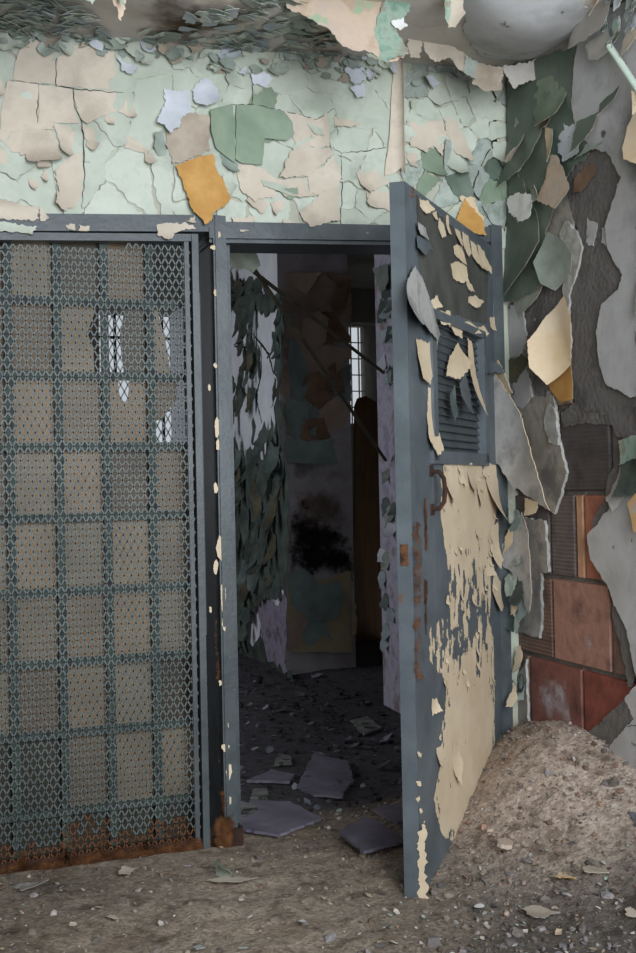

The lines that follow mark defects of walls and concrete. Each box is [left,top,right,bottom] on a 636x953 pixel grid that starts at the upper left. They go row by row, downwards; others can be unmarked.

crack [12,59,134,203]
crack [233,84,386,221]
peeling [0,221,37,234]
peeling [156,216,196,240]
peeling [279,0,636,842]
peeling [209,253,357,680]
leakage [293,523,349,574]
rust [1,817,234,872]
peeling [118,866,136,875]
peeling [416,781,429,899]
peeling [553,865,610,879]
peeling [521,905,561,918]